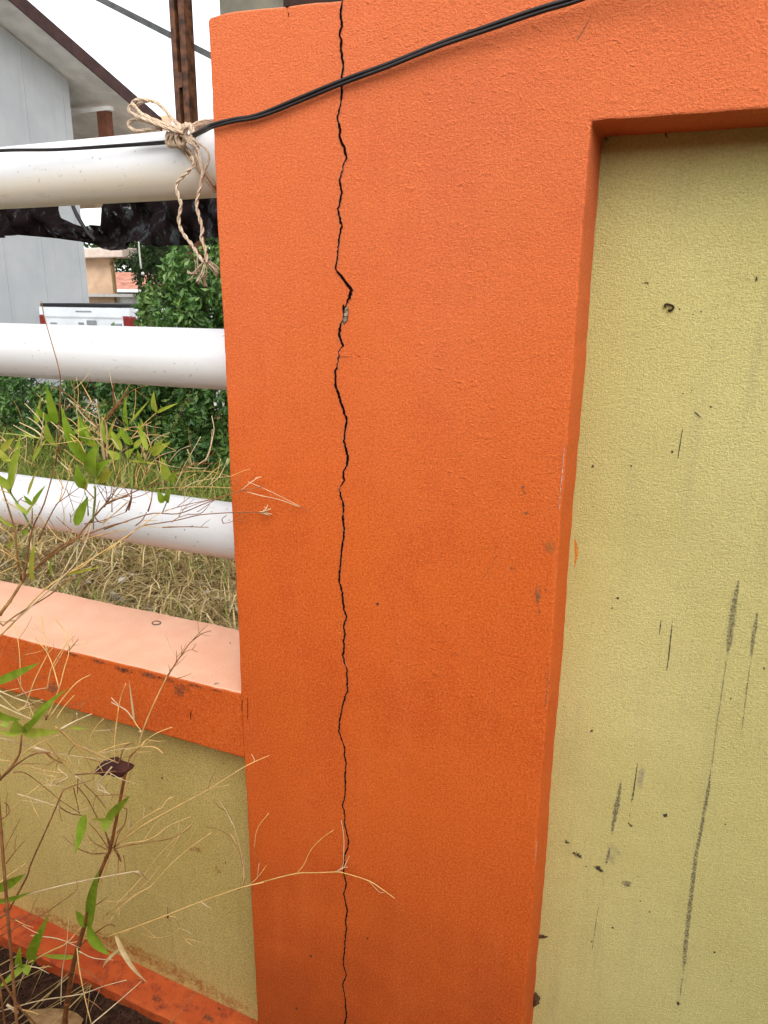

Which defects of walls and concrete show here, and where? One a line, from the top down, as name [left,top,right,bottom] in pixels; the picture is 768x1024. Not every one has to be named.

crack [334,0,360,1024]